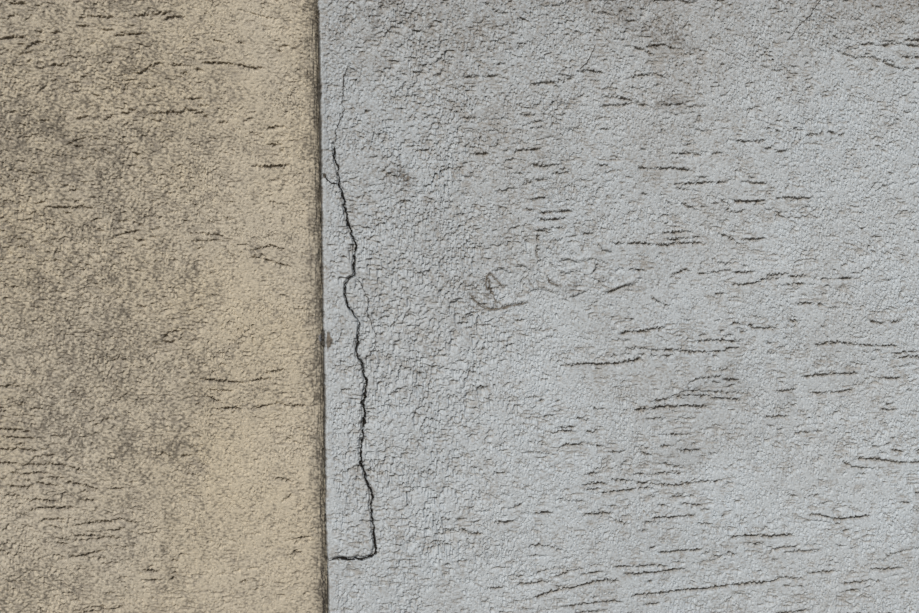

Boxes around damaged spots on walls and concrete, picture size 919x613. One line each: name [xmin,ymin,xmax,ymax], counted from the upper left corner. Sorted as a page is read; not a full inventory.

crack [320,67,377,613]